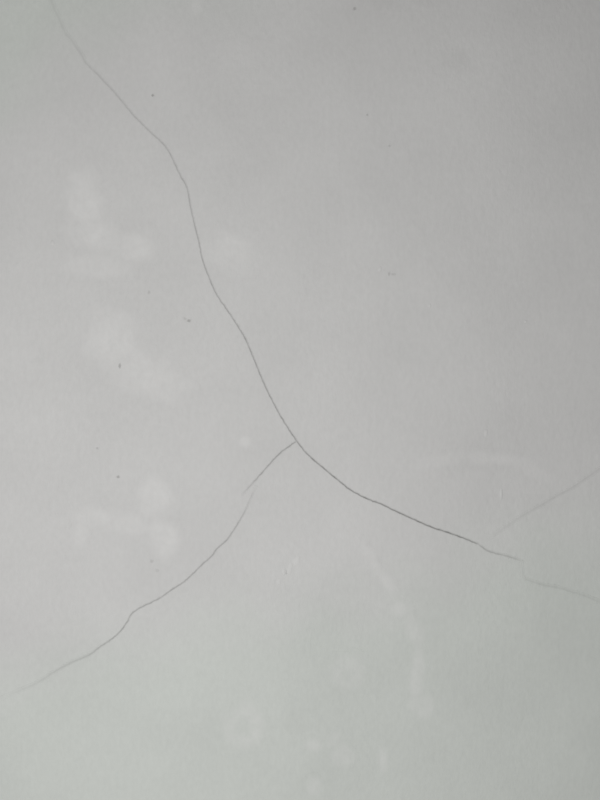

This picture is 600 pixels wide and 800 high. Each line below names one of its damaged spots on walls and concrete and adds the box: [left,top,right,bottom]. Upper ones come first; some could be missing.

crack [0,486,257,701]
crack [49,0,600,604]